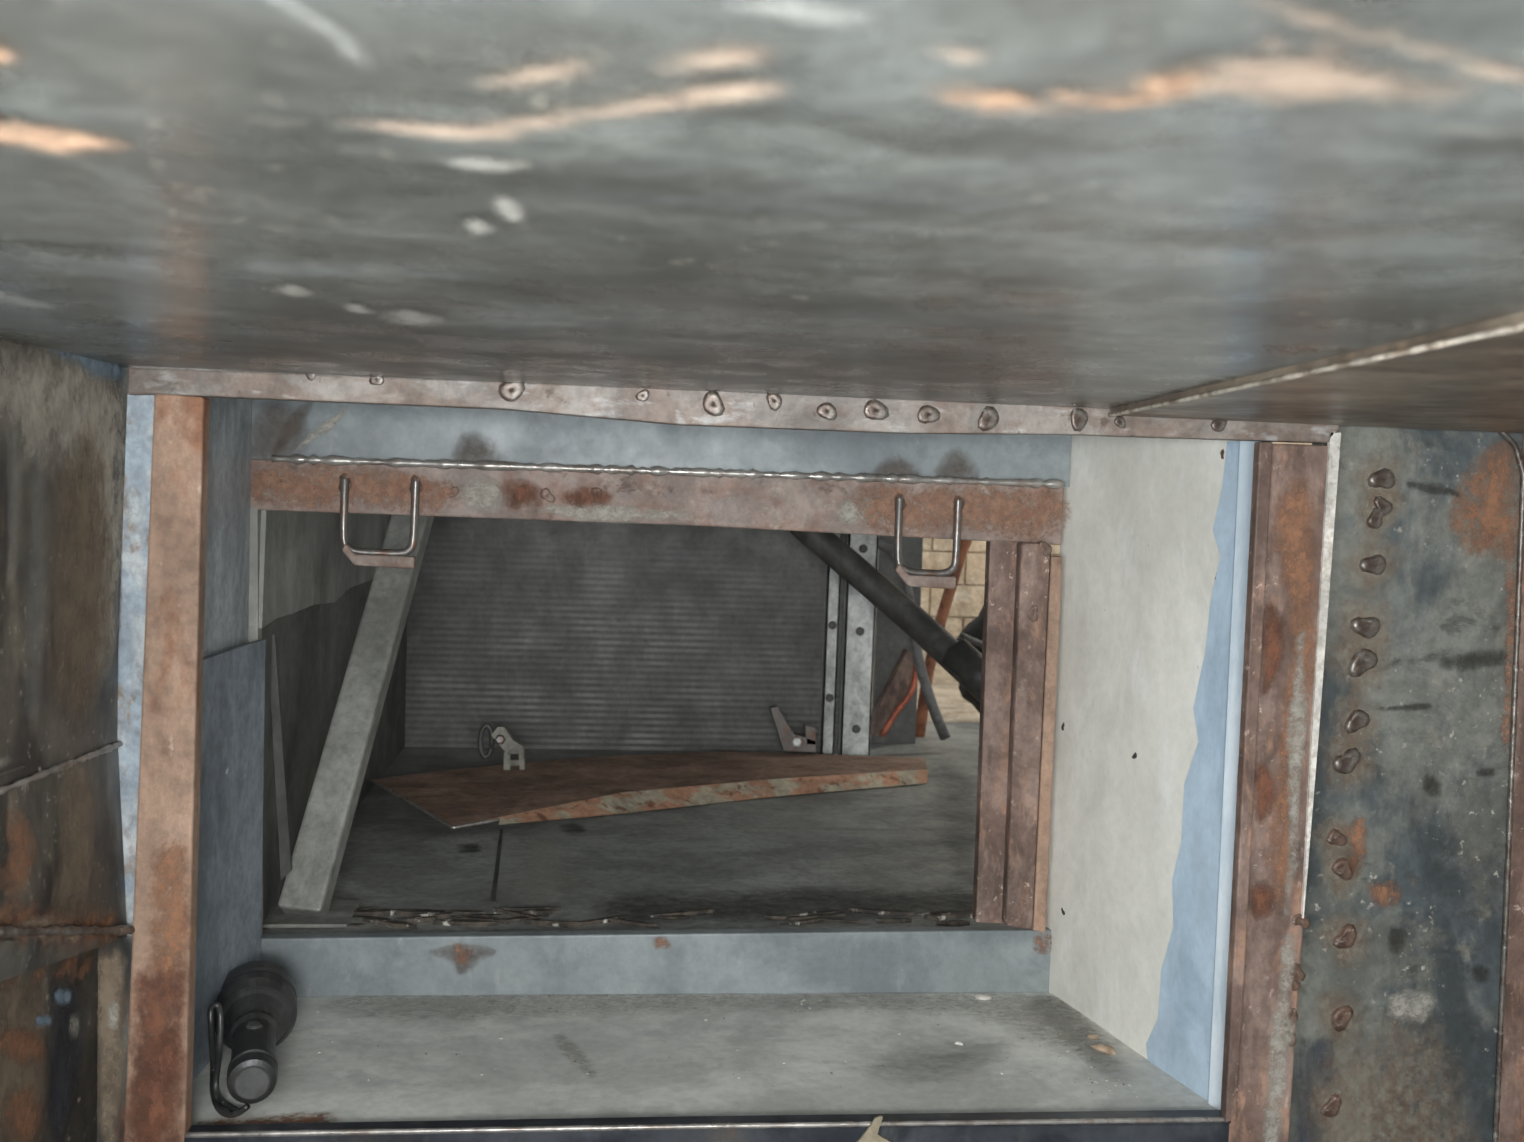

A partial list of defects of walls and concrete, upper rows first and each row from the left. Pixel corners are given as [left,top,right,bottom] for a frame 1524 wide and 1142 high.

corrosion [250,463,453,512]
corrosion [507,483,538,506]
corrosion [565,488,609,506]
corrosion [856,484,1068,540]
corrosion [1255,485,1317,892]
corrosion [124,846,189,1142]